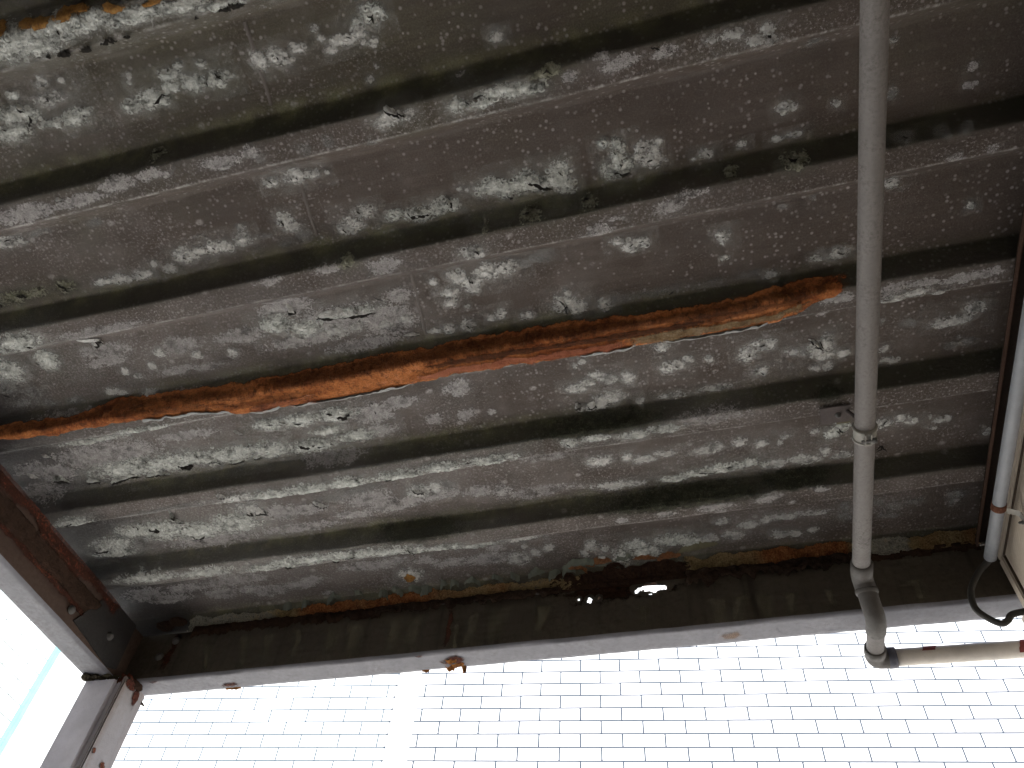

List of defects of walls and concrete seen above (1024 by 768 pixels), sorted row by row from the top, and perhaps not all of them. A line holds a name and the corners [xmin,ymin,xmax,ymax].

rust [0,0,246,66]
rust [0,245,856,670]
peeling [548,541,718,582]
rust [871,527,981,562]
rust [441,656,466,674]
rust [117,673,156,707]